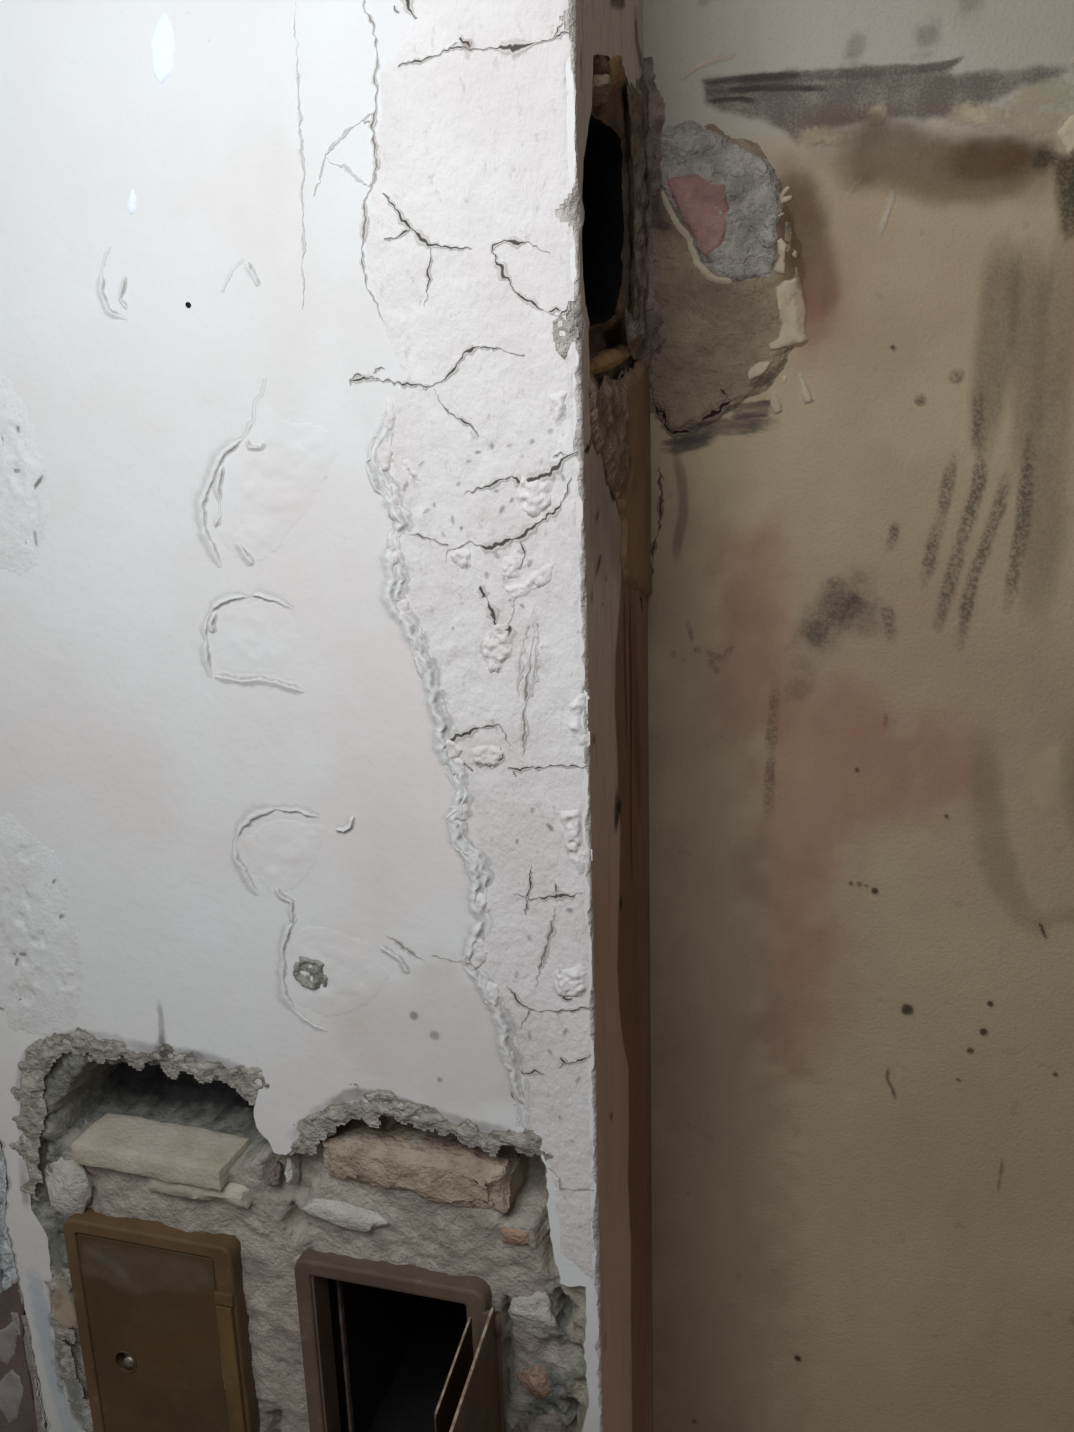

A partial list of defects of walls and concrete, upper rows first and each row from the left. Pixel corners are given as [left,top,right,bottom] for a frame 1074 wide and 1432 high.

leakage [714,73,800,93]
leakage [838,59,958,77]
crack [293,0,583,321]
peeling [778,185,792,217]
leakage [781,189,829,307]
leakage [1035,150,1074,233]
peeling [747,238,814,415]
crack [349,345,523,436]
crack [411,381,740,777]
flaking render [0,0,732,1432]
crack [386,935,472,965]
crack [507,866,593,1028]